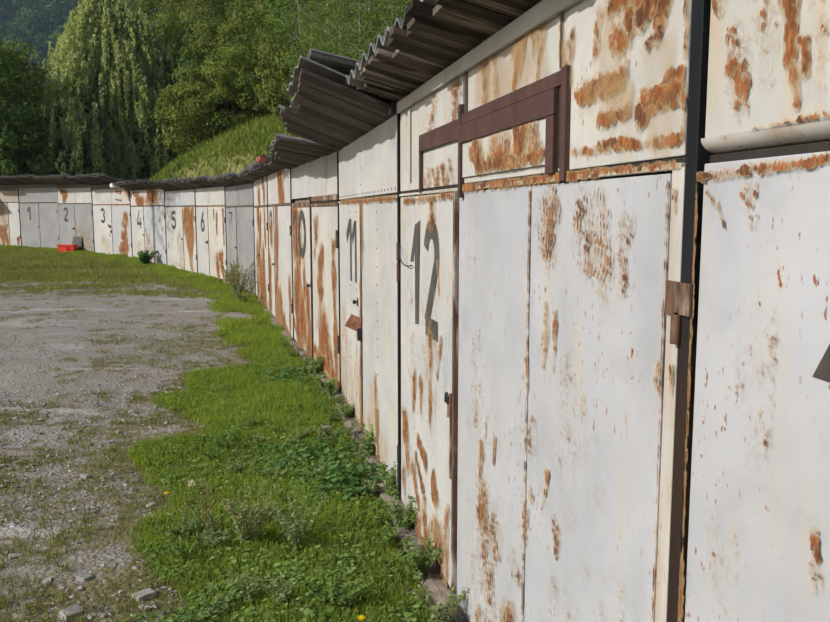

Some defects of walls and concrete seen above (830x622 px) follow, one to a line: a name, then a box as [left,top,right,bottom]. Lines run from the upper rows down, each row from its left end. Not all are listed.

corrosion [559,29,574,70]
corrosion [574,0,670,107]
corrosion [573,65,686,156]
corrosion [725,25,750,112]
corrosion [753,0,830,129]
corrosion [99,189,159,256]
corrosion [182,205,225,280]
corrosion [256,169,340,390]
corrosion [306,122,675,297]
corrosion [694,153,829,237]
corrosion [409,311,442,420]
corrosion [470,437,528,622]